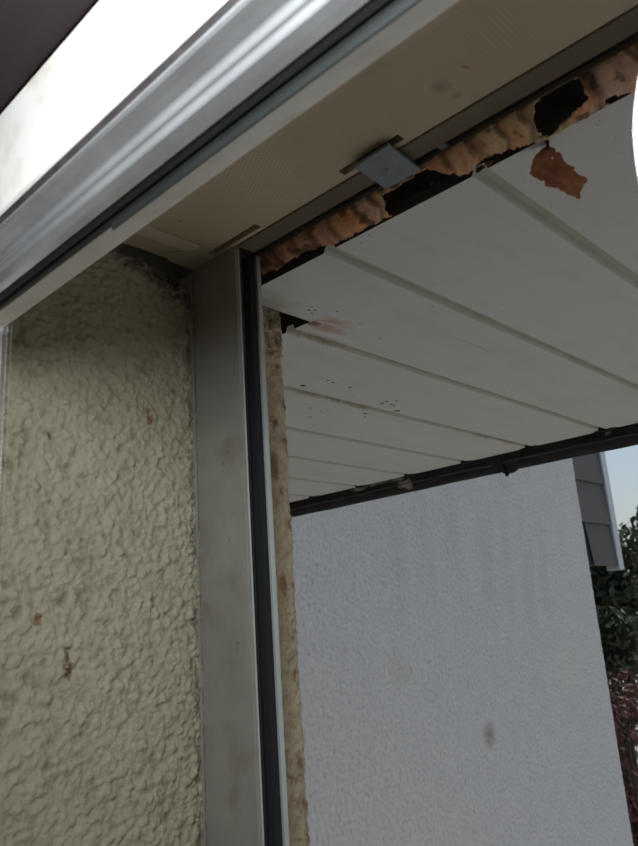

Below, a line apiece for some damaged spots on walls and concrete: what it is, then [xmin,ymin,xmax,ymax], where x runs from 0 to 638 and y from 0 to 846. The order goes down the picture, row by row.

peeling [530,140,588,199]